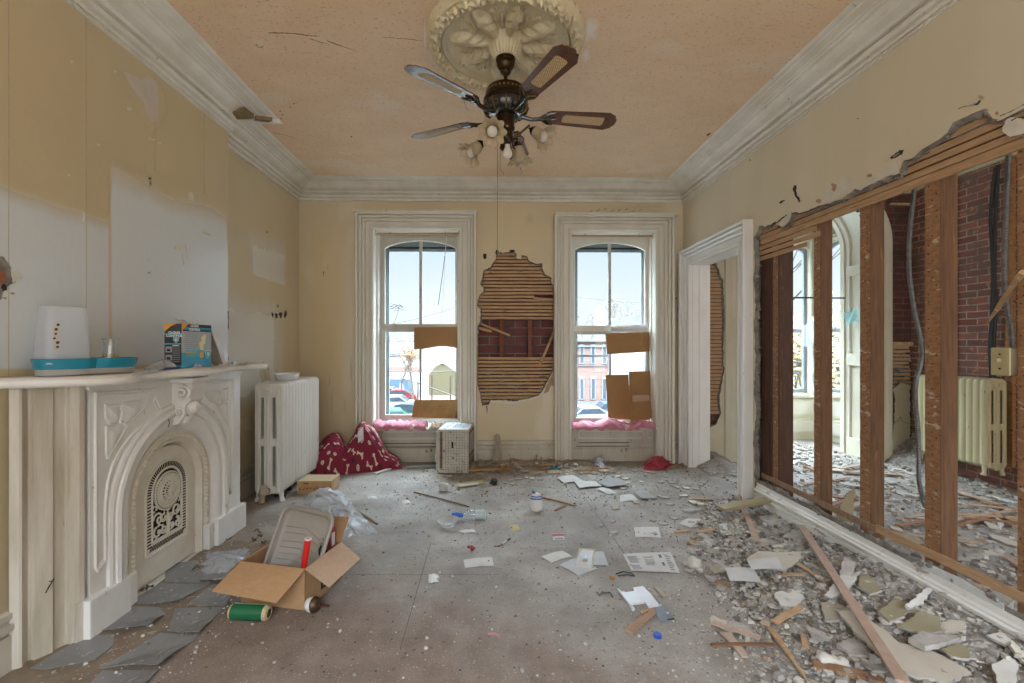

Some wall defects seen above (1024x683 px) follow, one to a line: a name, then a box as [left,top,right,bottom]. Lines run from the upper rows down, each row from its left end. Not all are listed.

spalling [0,256,23,300]
flaking render [477,250,554,408]
flaking render [710,260,725,456]
spalling [753,98,999,478]